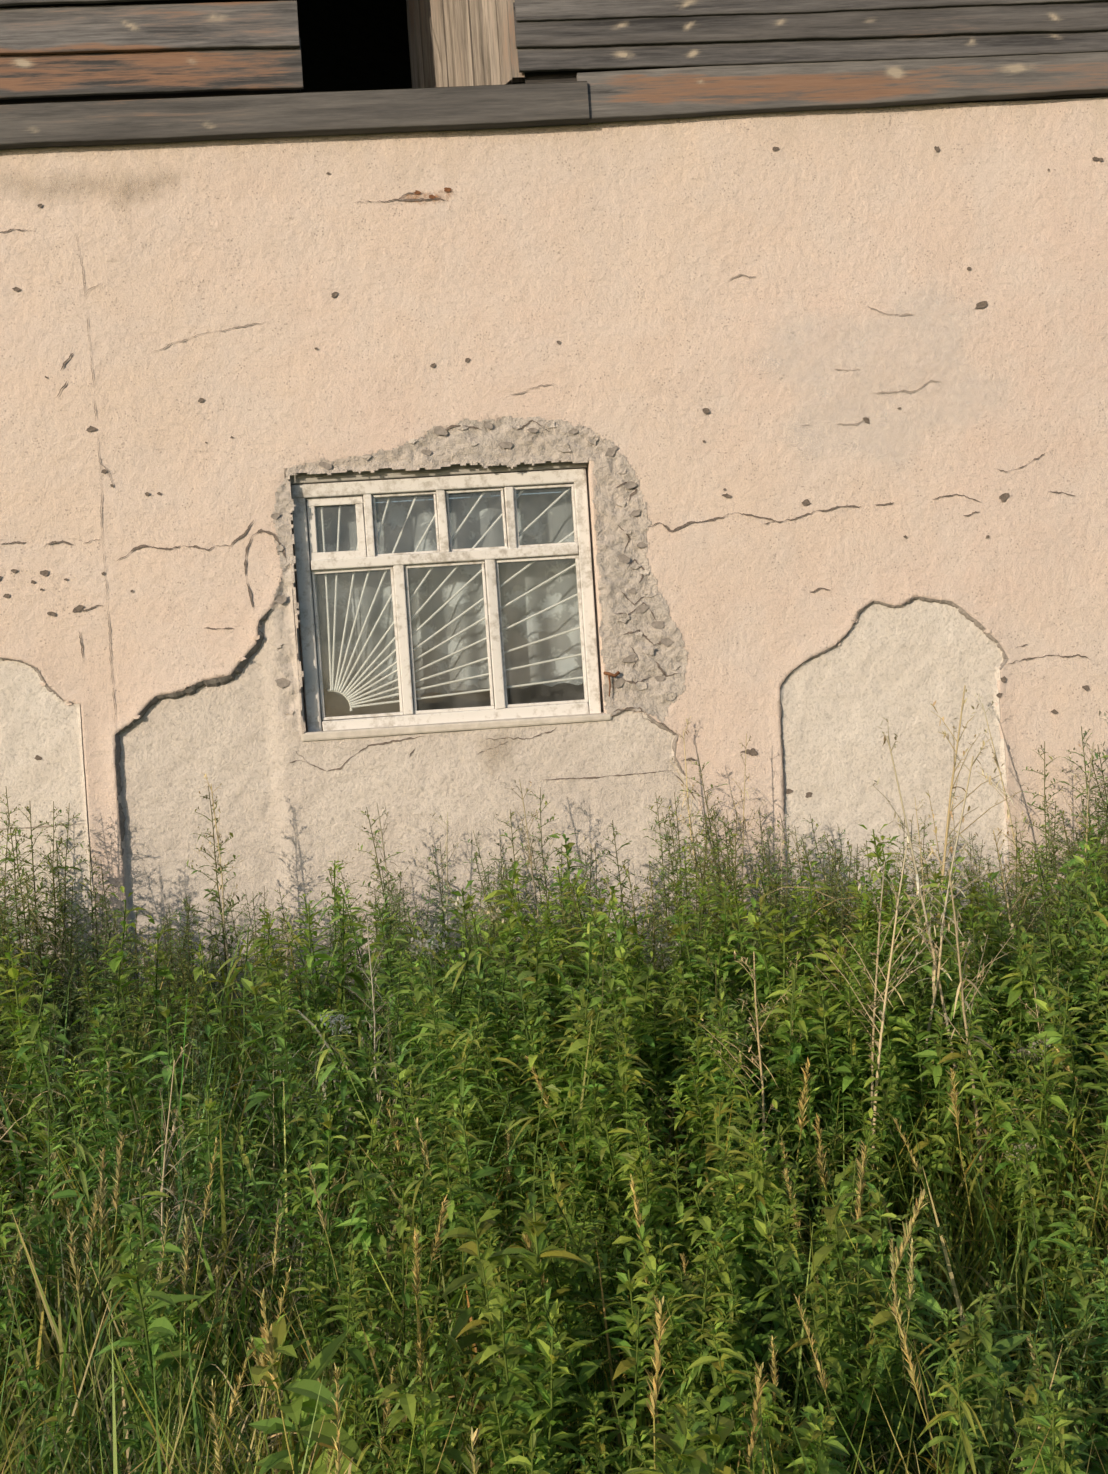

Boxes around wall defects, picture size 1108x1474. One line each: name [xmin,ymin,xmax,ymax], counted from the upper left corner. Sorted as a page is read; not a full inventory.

spalling [0,569,68,598]
peeling [0,657,98,1027]
crack [3,237,286,720]
peeling [115,416,712,1020]
crack [650,502,895,532]
peeling [780,596,1009,968]
crack [935,494,979,516]
crack [999,453,1075,496]